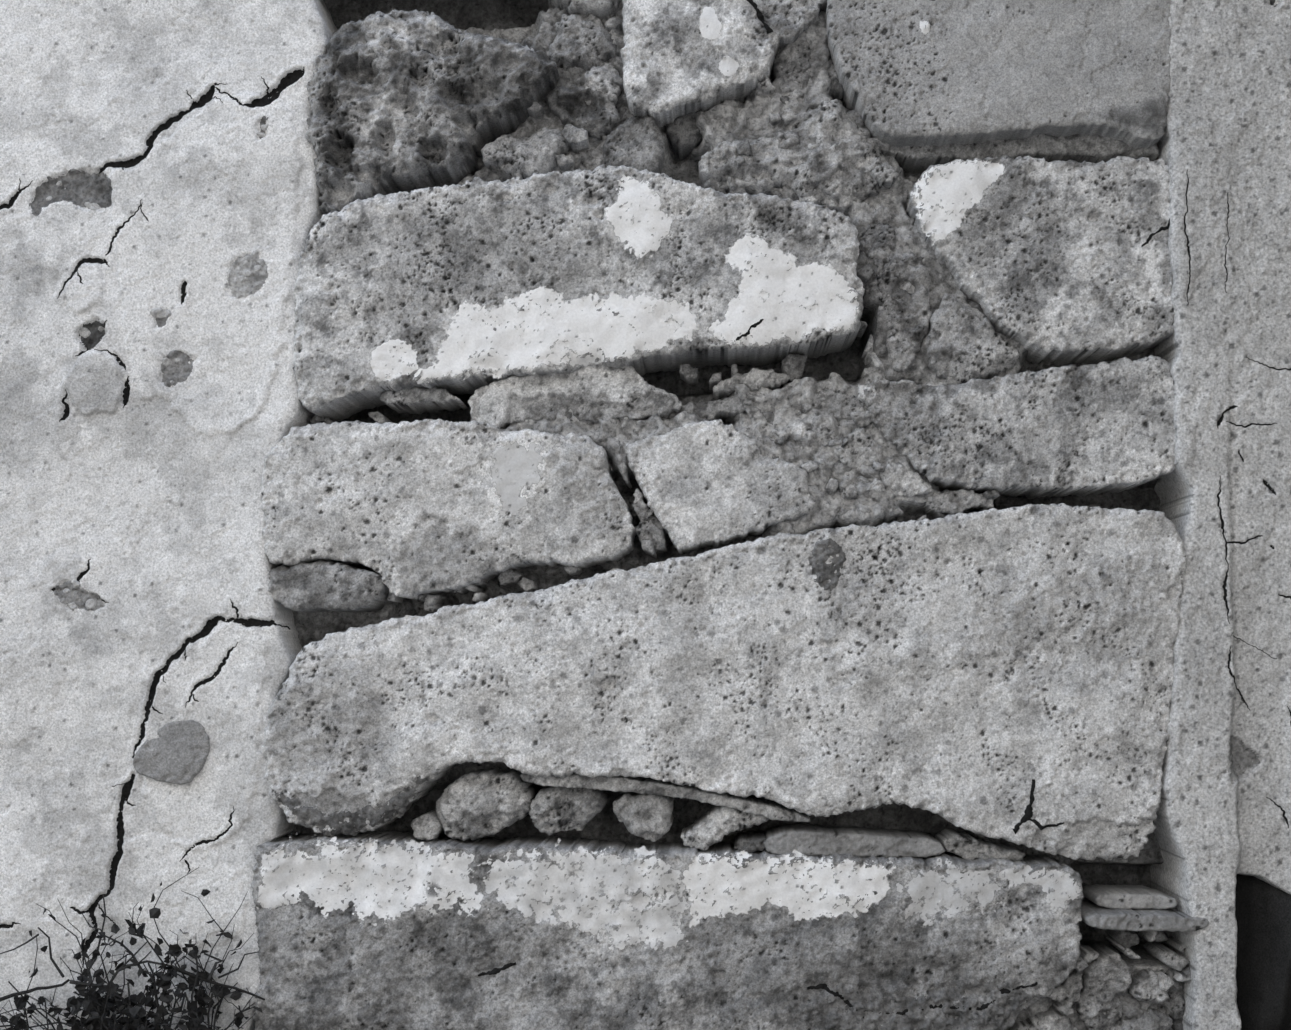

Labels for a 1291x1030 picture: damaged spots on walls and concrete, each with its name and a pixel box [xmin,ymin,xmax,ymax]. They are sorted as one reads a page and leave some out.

crack [98,67,305,176]
crack [0,178,33,210]
spalling [29,169,113,216]
crack [58,199,149,298]
crack [59,389,70,422]
crack [75,320,130,408]
crack [70,599,290,974]